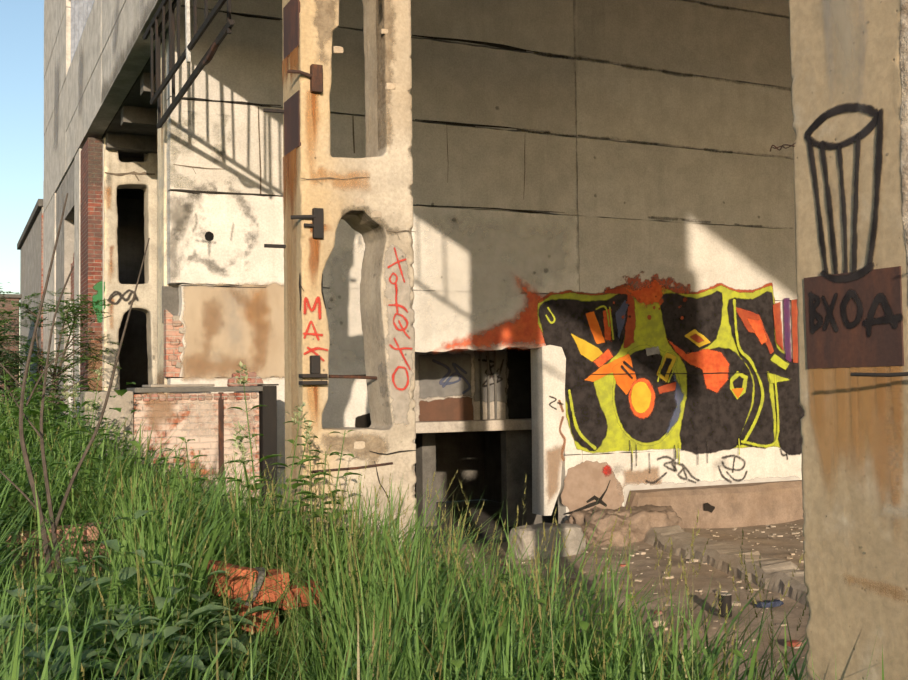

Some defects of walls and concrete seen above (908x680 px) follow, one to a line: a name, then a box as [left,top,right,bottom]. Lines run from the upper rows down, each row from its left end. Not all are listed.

corrosion [282,46,298,78]
corrosion [307,91,317,138]
spalling [900,0,908,281]
corrosion [283,148,296,204]
leakage [167,203,190,266]
corrosion [310,223,319,274]
spalling [162,286,185,377]
leakage [182,283,285,379]
corrosion [809,366,902,504]